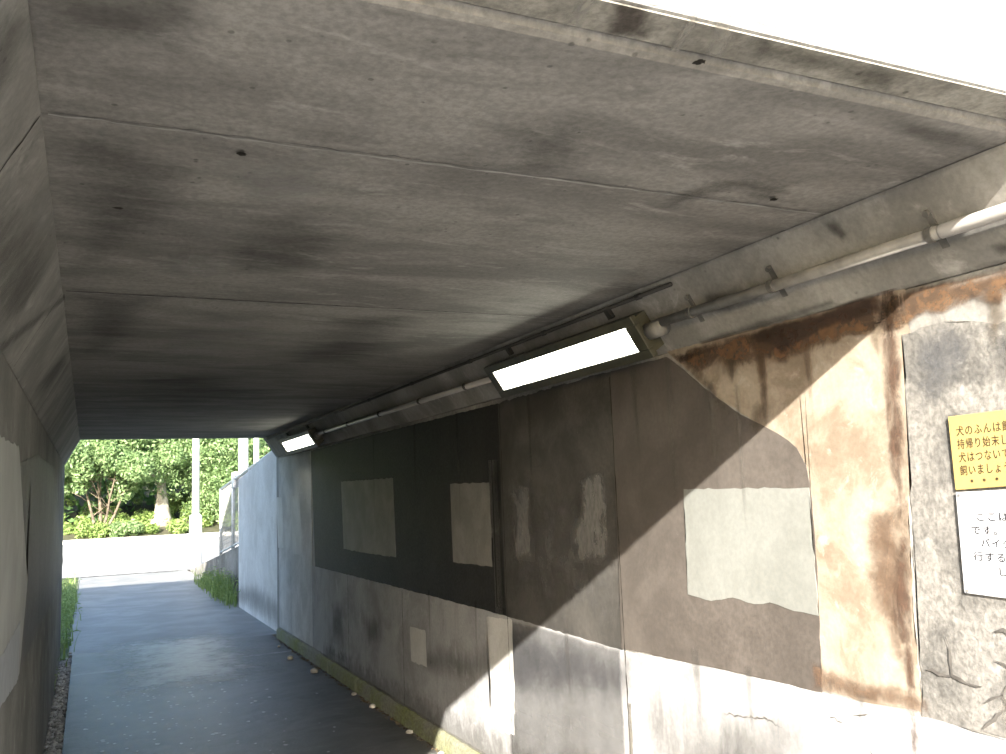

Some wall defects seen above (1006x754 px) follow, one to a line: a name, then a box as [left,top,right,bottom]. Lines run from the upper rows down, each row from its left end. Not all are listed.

leakage [612,3,644,34]
rust [679,271,1006,487]
rust [815,513,920,706]
crack [927,636,1006,730]